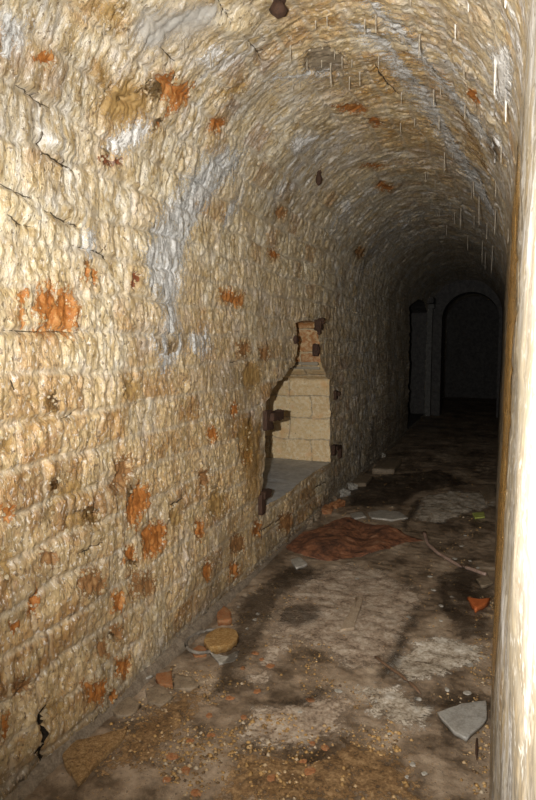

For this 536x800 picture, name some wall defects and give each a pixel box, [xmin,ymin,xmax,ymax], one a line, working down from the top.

crack [35,132,73,172]
crack [0,184,77,227]
leakage [140,139,247,374]
crack [34,705,49,761]